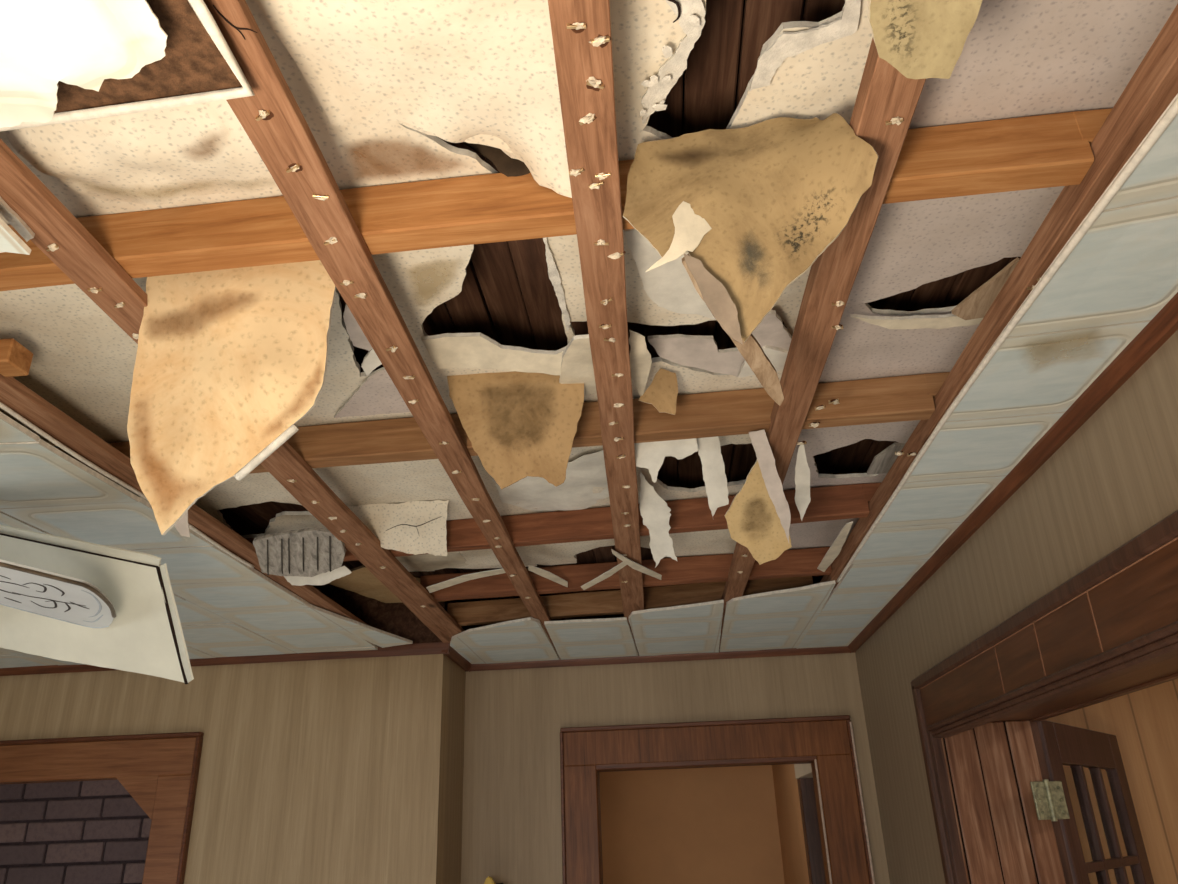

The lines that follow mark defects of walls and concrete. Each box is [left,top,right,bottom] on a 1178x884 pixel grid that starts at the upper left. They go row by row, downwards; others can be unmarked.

peeling [0,0,168,129]
spalling [640,0,706,124]
crack [668,0,681,23]
spalling [749,0,861,92]
spalling [543,237,571,331]
water stain [745,242,761,271]
water stain [785,195,832,252]